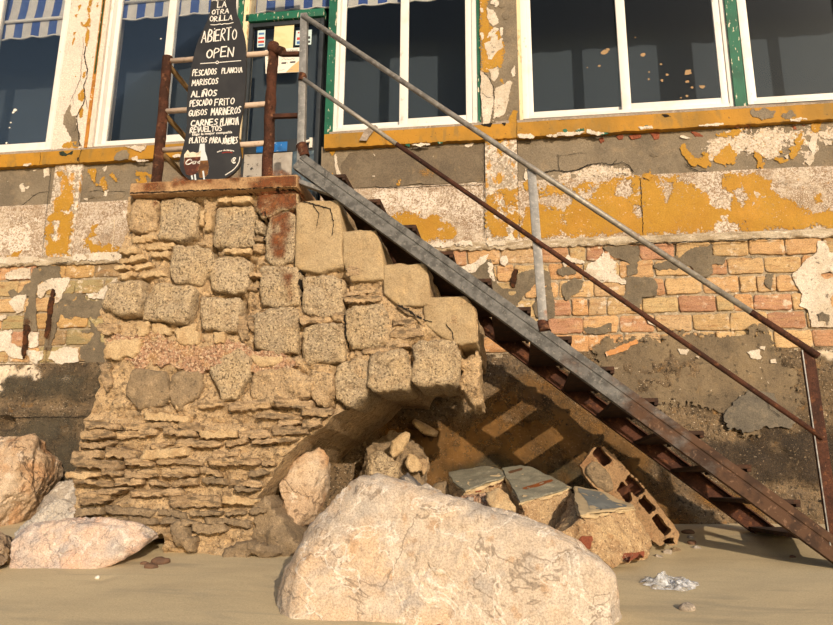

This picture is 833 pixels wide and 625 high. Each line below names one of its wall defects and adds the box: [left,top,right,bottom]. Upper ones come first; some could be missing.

crack [70,43,88,163]
peeling [479,0,518,124]
peeling [0,163,121,280]
peeling [373,180,473,248]
peeling [462,107,833,285]
crack [544,153,786,244]
corrosion [21,319,31,359]
flaking render [0,295,79,391]
leakage [0,374,84,398]
corrosion [44,288,56,339]
flaking render [792,240,833,328]
leakage [3,415,79,481]